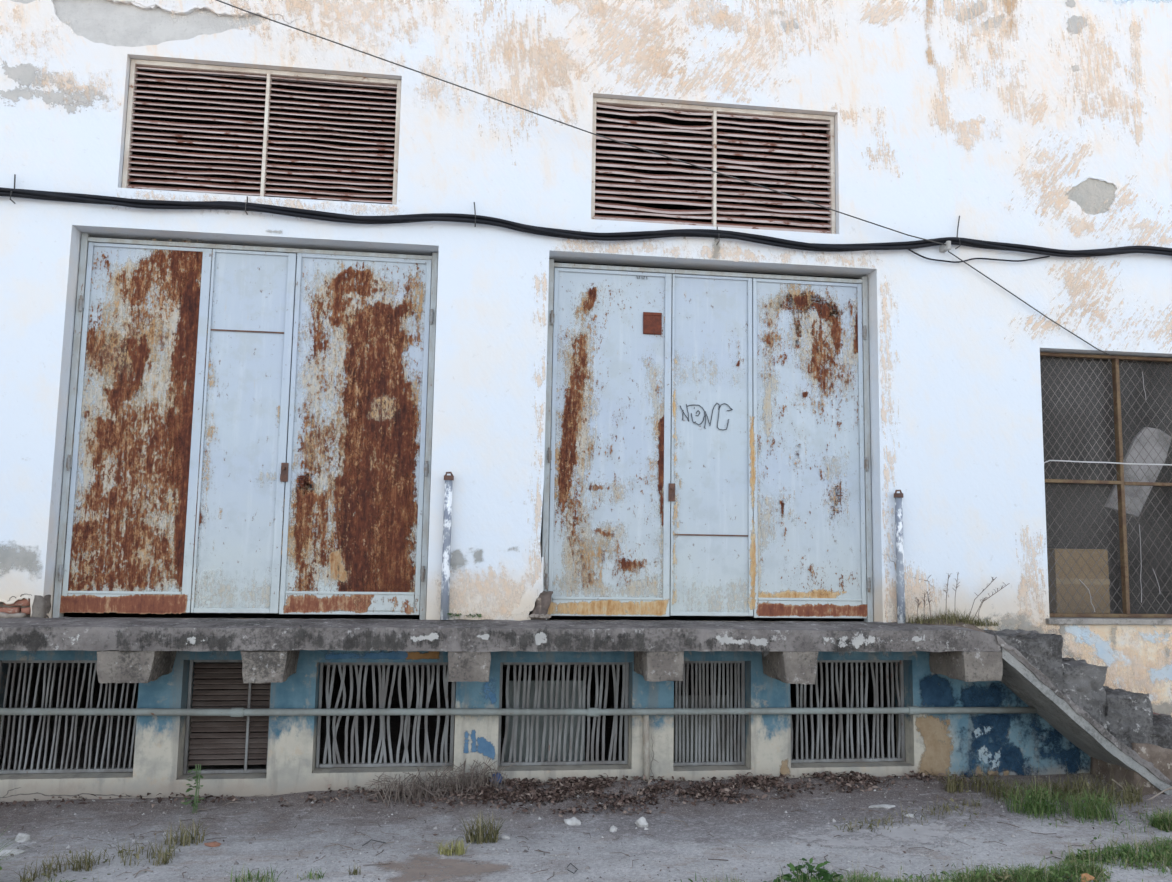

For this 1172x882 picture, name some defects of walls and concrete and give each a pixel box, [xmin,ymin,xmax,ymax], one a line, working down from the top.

peeling [3,41,121,114]
flaking render [53,0,269,47]
peeling [423,0,848,145]
flaking render [861,0,1172,247]
rust [58,239,429,614]
rust [548,283,870,617]
flaking render [0,595,31,618]
water stain [0,545,40,572]
peeling [915,674,1089,777]